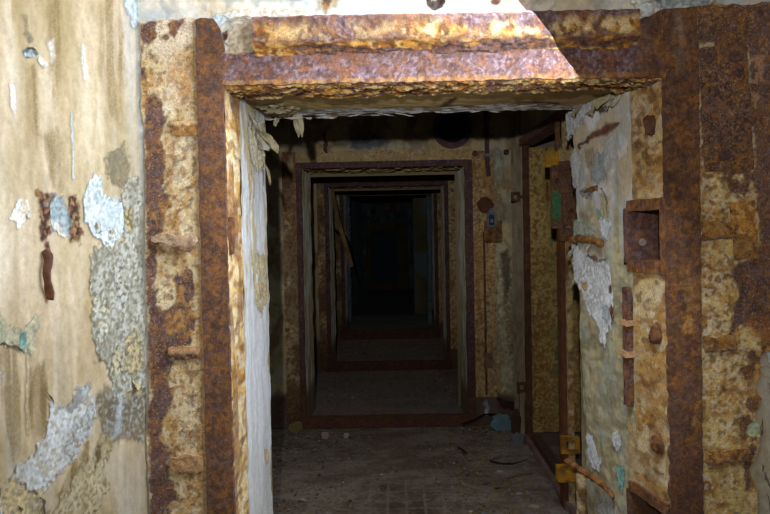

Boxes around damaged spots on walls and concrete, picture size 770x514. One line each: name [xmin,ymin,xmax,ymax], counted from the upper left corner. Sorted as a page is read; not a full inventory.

damp [47,6,60,64]
damp [9,83,17,114]
damp [107,141,130,187]
peeling [248,92,622,199]
spalling [50,192,72,238]
peeling [567,136,618,348]
peeling [83,173,146,403]
spalling [251,250,269,318]
peeling [0,315,40,355]
damp [0,349,48,455]
peeling [0,381,115,514]
damp [59,441,89,496]